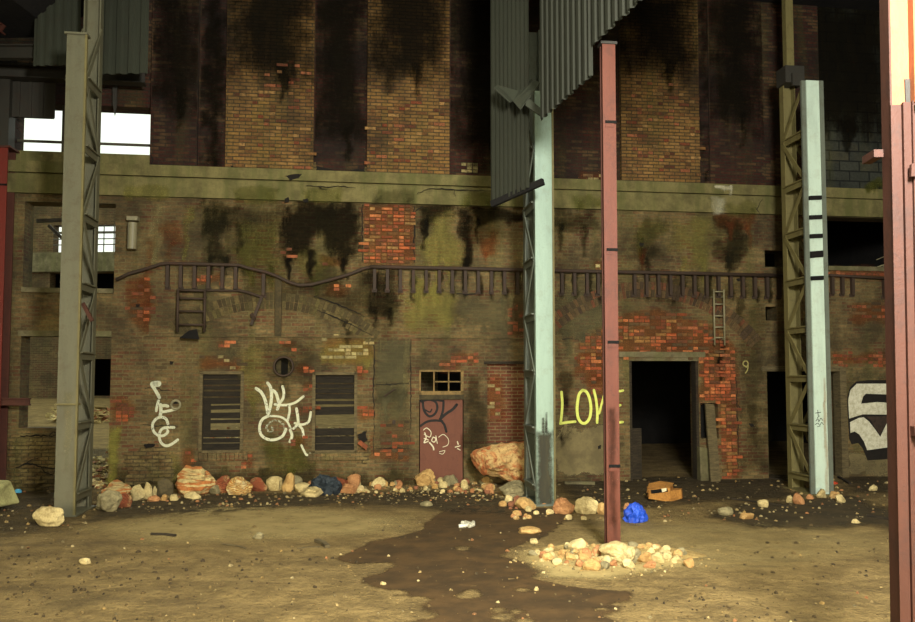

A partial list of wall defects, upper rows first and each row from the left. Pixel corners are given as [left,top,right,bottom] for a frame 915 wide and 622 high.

leakage [305,250,316,278]
spalling [358,203,416,264]
flaking render [555,288,603,411]
spalling [487,377,501,419]
spalling [618,313,755,479]
flaking render [556,416,604,476]